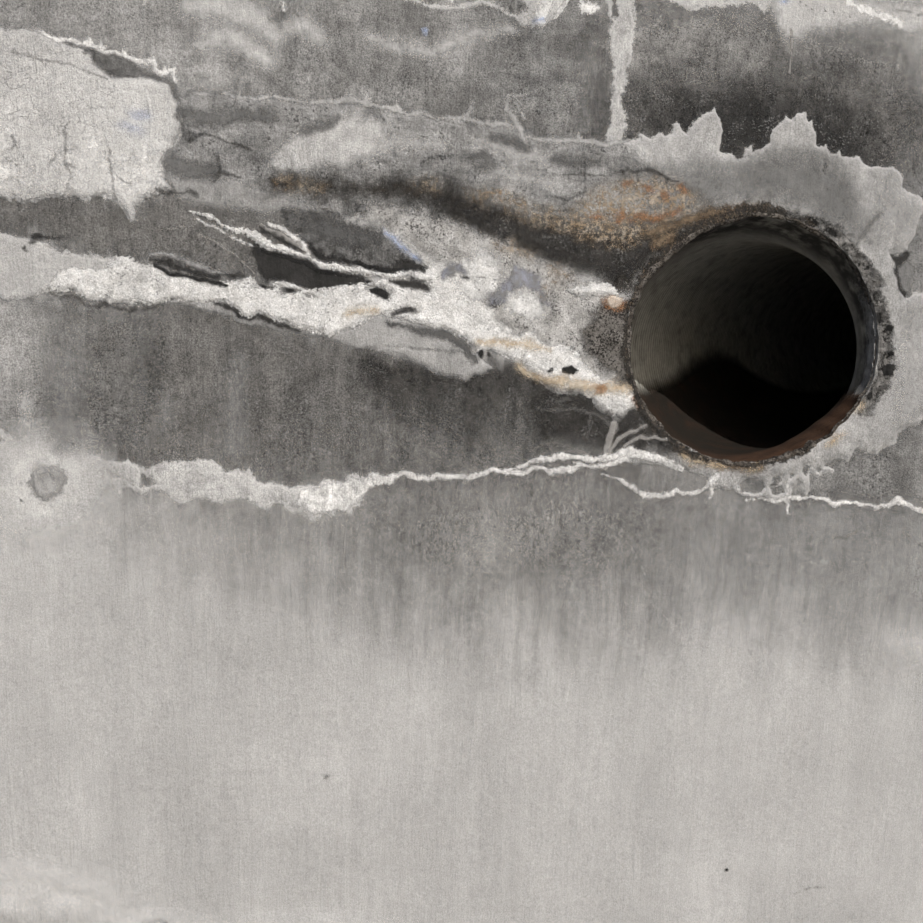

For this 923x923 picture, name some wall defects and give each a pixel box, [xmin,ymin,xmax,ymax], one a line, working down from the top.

peeling [0,27,181,223]
water stain [0,173,721,597]
water stain [0,0,923,199]
rust [480,179,768,250]
water stain [745,419,923,520]
spalling [787,211,896,416]
spalling [891,251,915,296]
water stain [892,214,923,298]